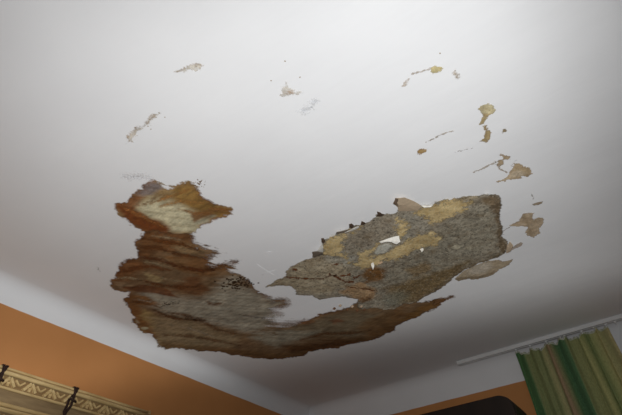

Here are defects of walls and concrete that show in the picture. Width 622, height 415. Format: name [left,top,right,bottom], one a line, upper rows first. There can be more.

peeling [478,103,495,142]
peeling [497,154,533,182]
flaking render [266,194,544,312]